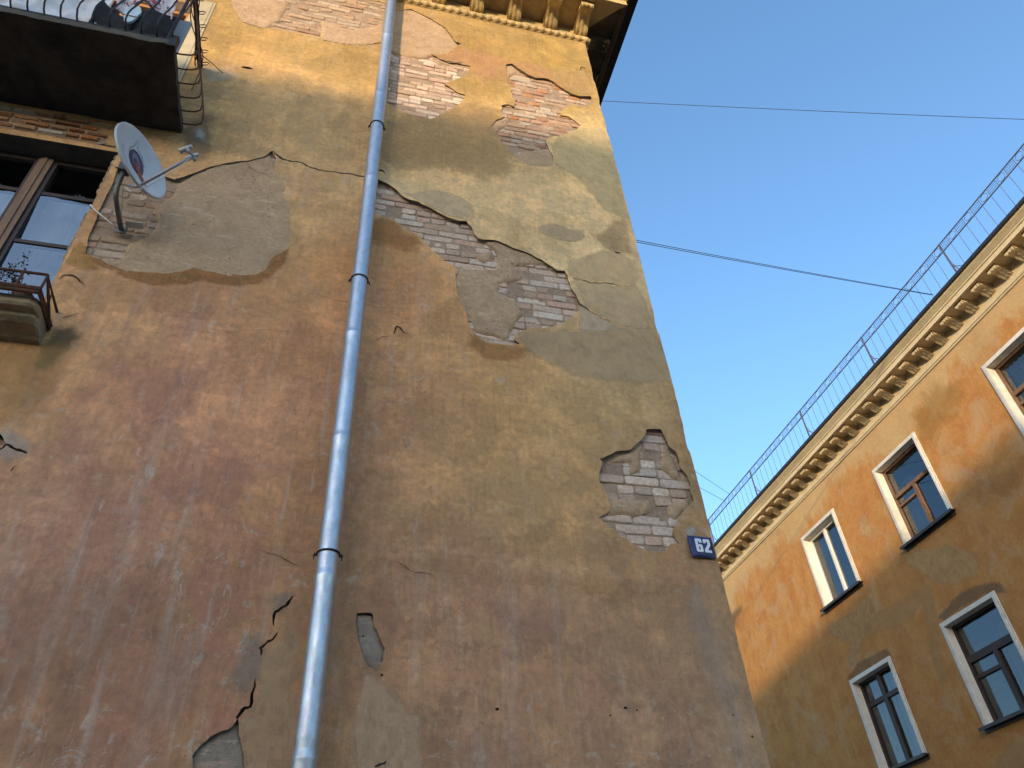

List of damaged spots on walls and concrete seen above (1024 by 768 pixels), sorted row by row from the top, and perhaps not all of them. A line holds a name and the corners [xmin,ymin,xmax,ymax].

spalling [0,105,292,276]
crack [272,151,385,177]
spalling [230,0,470,119]
spalling [492,64,591,167]
spalling [374,179,581,345]
crack [0,443,27,471]
spalling [599,429,693,554]
crack [235,596,293,722]
spalling [355,613,385,676]
spalling [192,720,245,768]